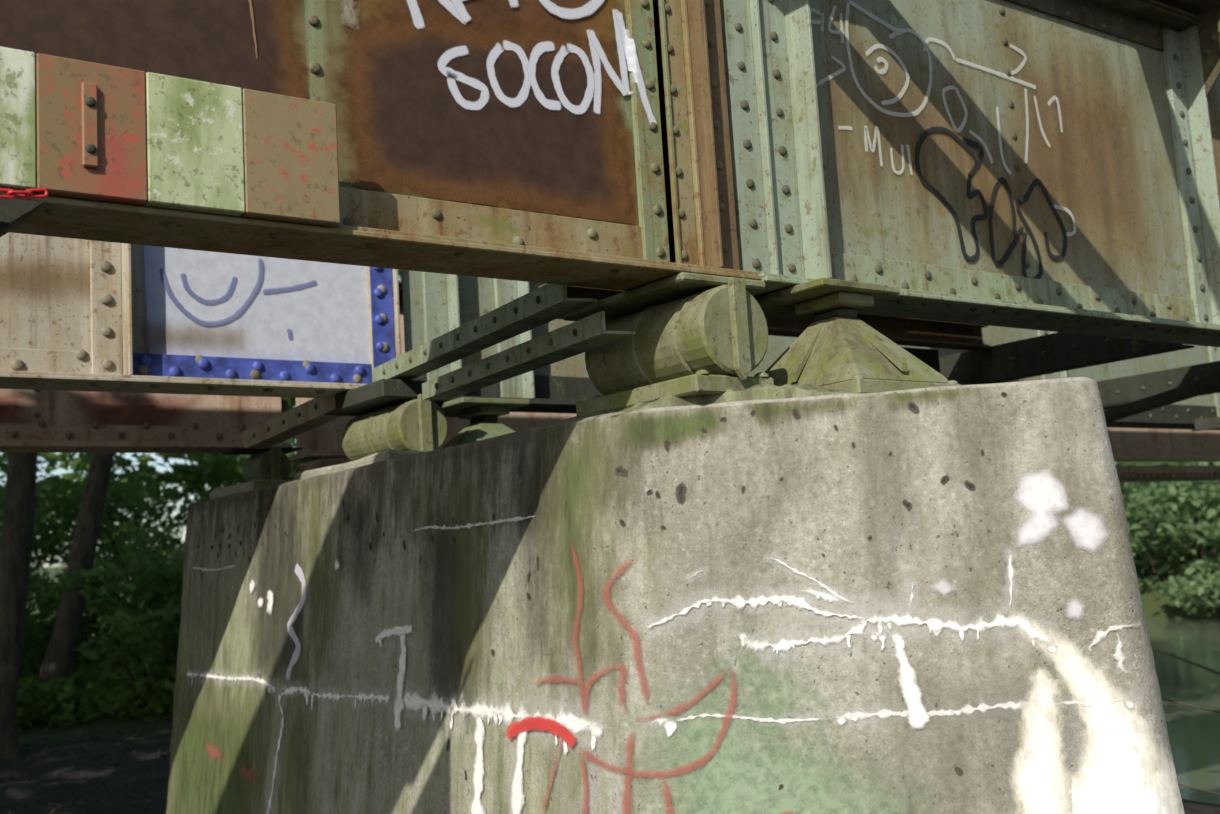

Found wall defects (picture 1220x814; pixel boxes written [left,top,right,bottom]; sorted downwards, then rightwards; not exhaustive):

corrosion [0,0,307,99]
corrosion [338,0,639,225]
leakage [525,457,548,542]
leakage [1016,470,1107,551]
leakage [422,463,488,729]
leakage [1067,600,1082,618]
leakage [375,624,412,731]
leakage [471,713,503,814]
leakage [511,721,527,814]
leakage [588,725,602,750]
leakage [664,721,677,736]
leakage [1010,613,1185,814]